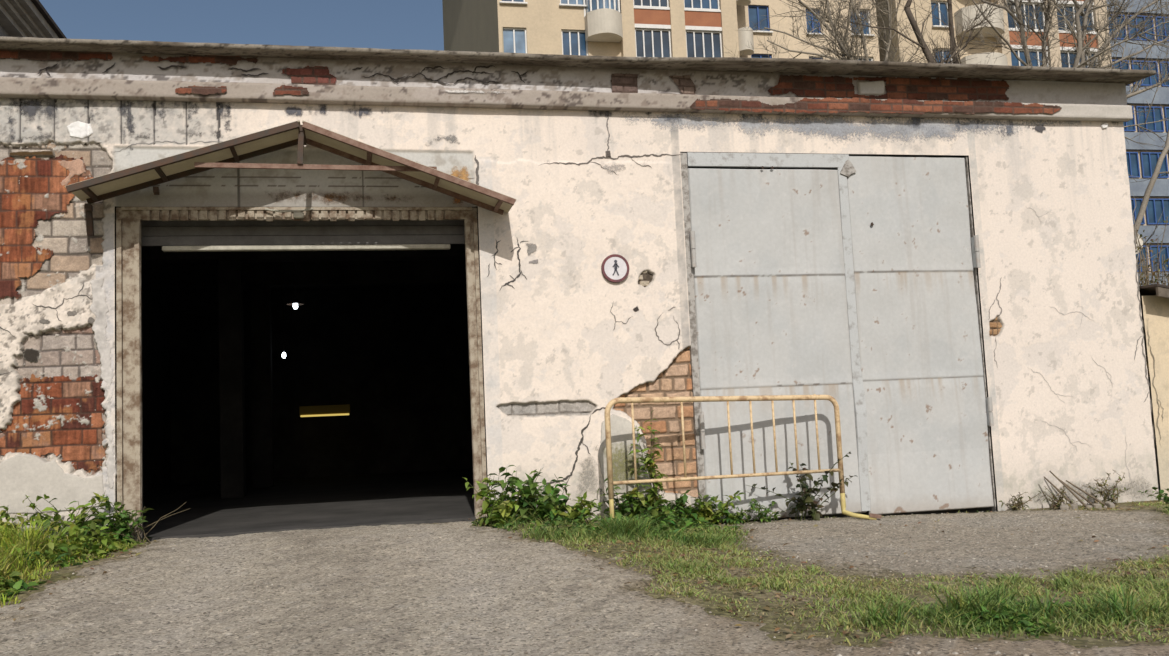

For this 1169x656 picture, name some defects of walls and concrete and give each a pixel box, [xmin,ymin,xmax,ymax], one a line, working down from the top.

crack [229,67,269,77]
flaking render [273,66,336,95]
crack [352,65,528,85]
flaking render [611,73,638,93]
flaking render [630,75,1079,141]
crack [544,116,683,175]
flaking render [0,121,113,304]
crack [487,239,527,290]
flaking render [0,311,108,476]
crack [539,407,606,487]
flaking render [613,347,698,497]